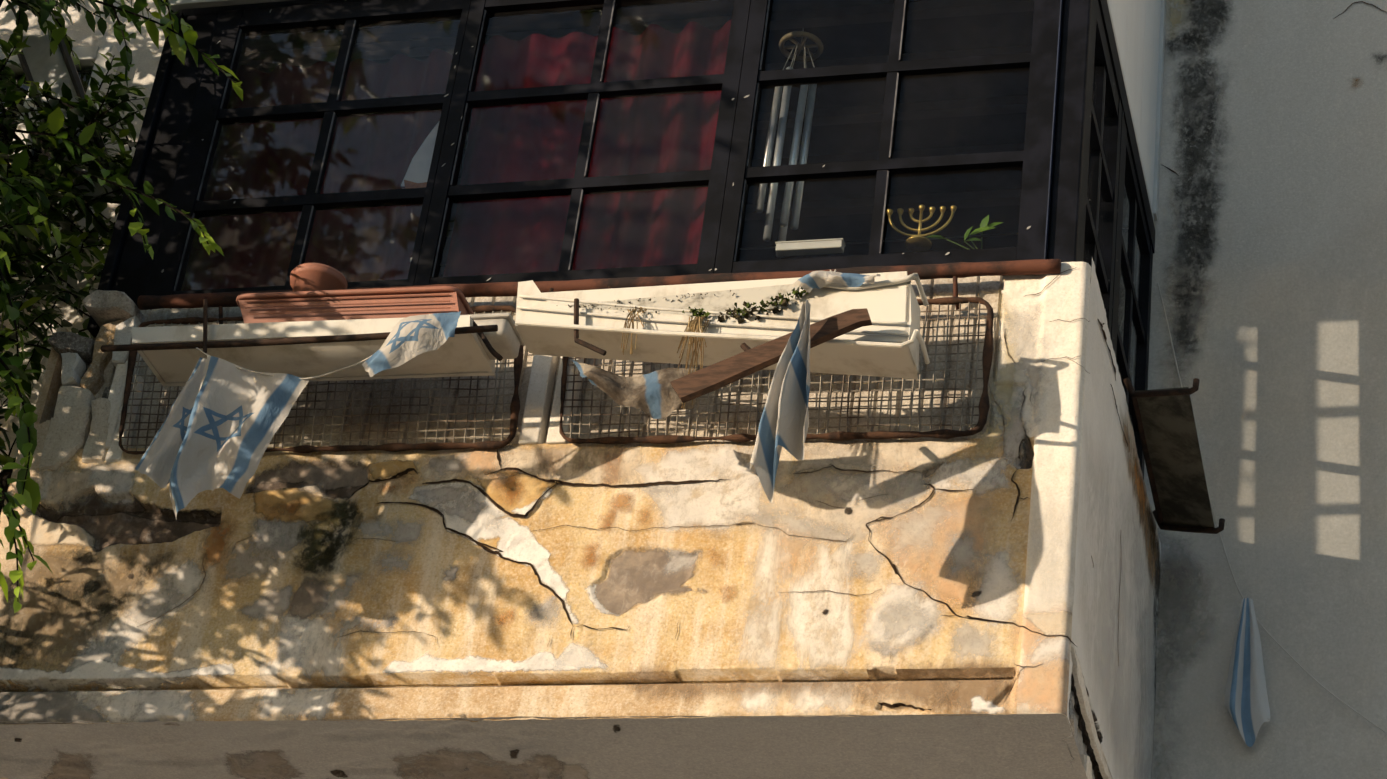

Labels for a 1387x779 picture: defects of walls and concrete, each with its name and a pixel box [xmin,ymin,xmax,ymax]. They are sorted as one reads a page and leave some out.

water stain [1168,0,1229,374]
flaking render [29,316,222,551]
water stain [0,547,161,669]
peeling [0,563,234,742]
water stain [259,502,358,719]
peeling [228,447,578,631]
peeling [383,643,606,675]
flaking render [586,548,705,616]
crack [337,450,1076,702]
peeling [44,752,94,779]
peeling [226,751,301,779]
peeling [393,748,588,779]